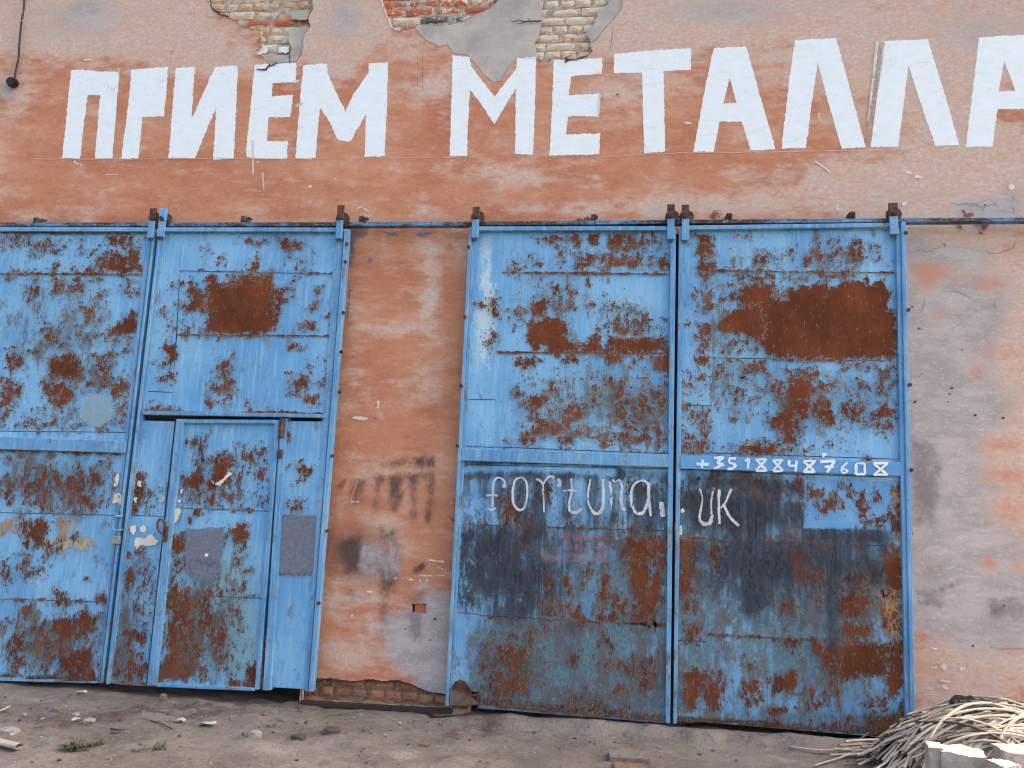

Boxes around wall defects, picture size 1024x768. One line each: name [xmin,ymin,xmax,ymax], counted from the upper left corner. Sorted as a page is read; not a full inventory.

spalling [208,0,313,63]
spalling [381,0,623,83]
corrosion [0,232,148,437]
corrosion [144,233,332,450]
corrosion [473,217,670,454]
corrosion [681,228,899,461]
peeling [130,525,159,550]
corrosion [0,432,315,690]
spalling [302,678,468,710]
corrosion [467,470,913,735]